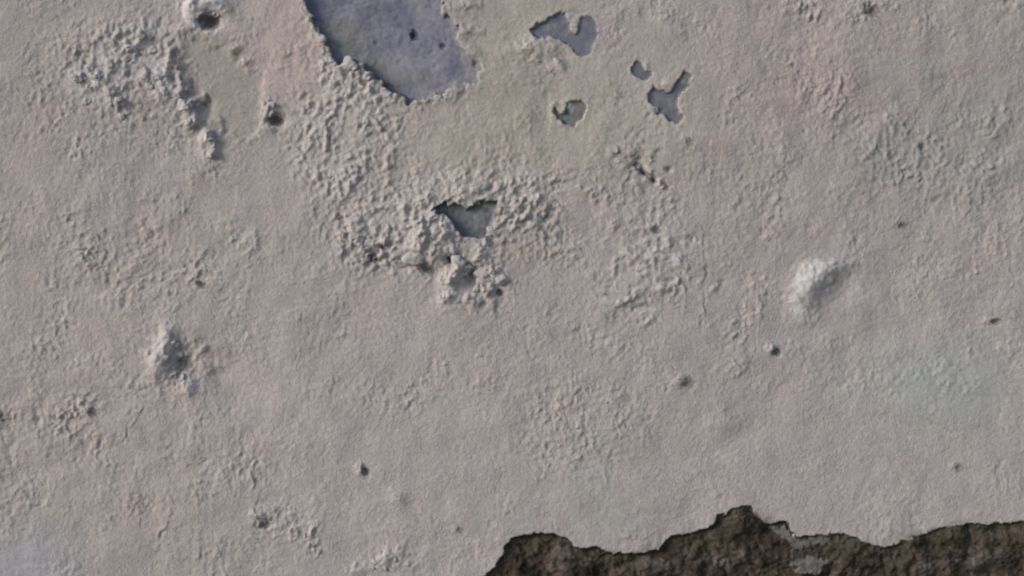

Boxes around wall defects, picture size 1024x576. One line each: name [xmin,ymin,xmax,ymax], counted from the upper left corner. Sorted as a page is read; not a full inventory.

peeling [518,11,599,72]
peeling [631,60,697,149]
spalling [294,0,587,313]
spalling [485,505,1024,576]